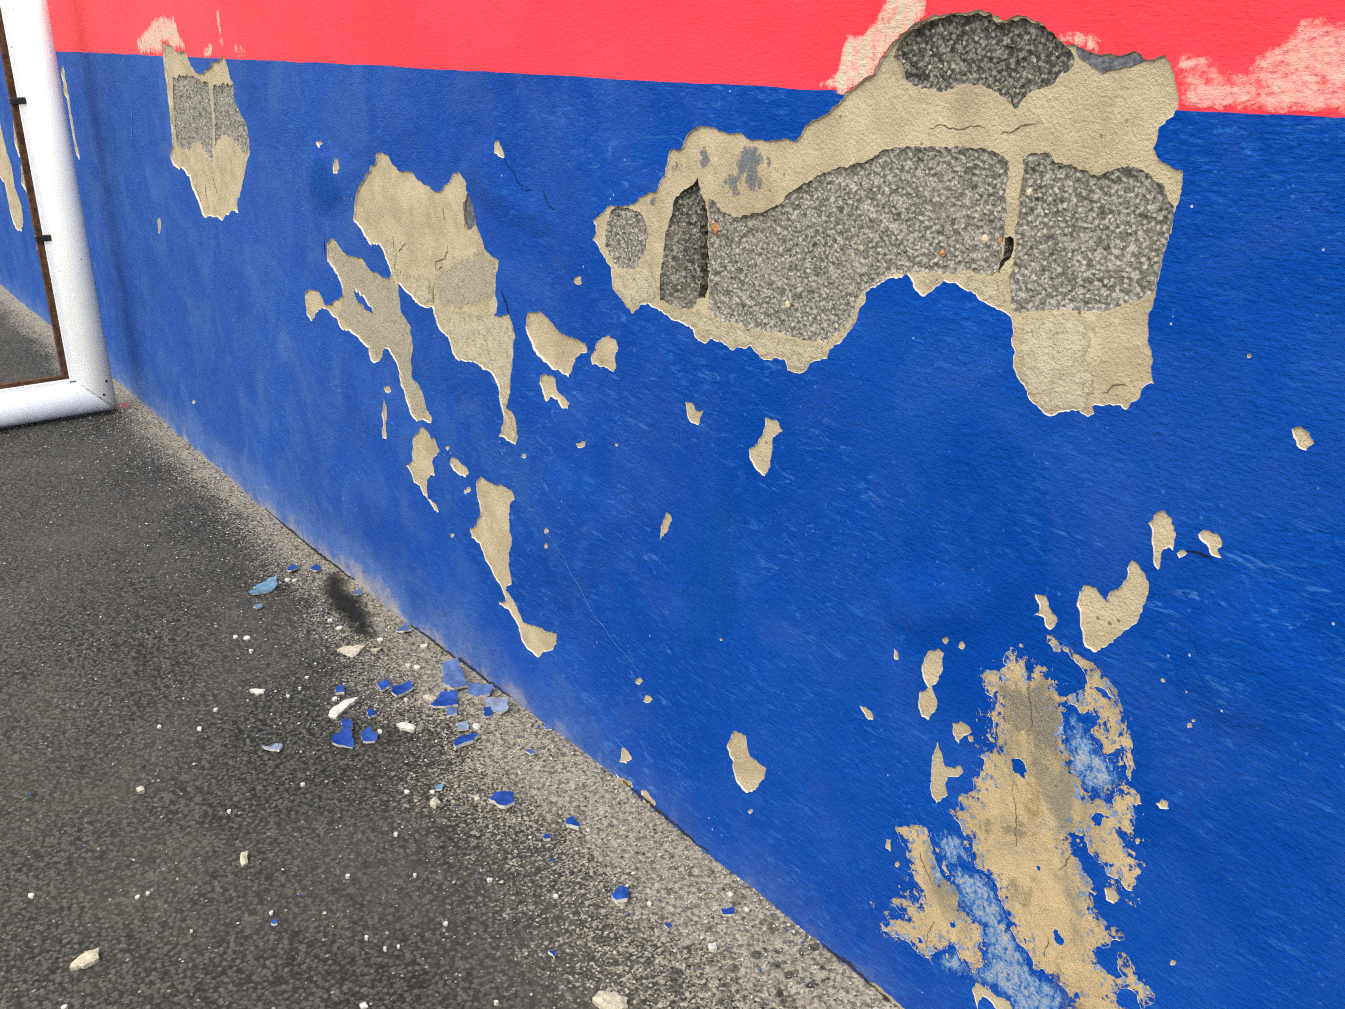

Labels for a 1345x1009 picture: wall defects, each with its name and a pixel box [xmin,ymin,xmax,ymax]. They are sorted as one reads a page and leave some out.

spalling [137,16,250,221]
flaking render [0,122,26,231]
spalling [593,0,1345,417]
flaking render [305,151,618,657]
flaking render [685,402,704,425]
flaking render [749,417,783,476]
flaking render [1198,530,1222,558]
flaking render [727,730,766,793]
flaking render [870,510,1187,1009]
flaking render [863,979,904,1009]